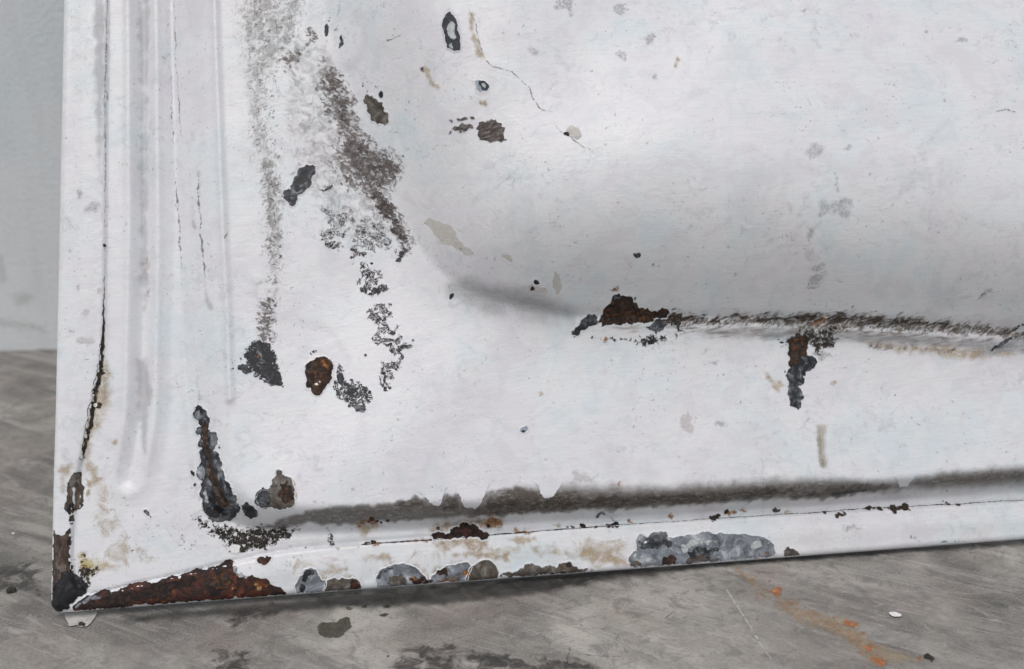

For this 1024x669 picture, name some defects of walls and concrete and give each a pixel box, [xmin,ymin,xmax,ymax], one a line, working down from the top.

peeling [440,9,462,53]
peeling [361,83,397,139]
peeling [281,163,319,209]
crack [78,276,105,460]
peeling [225,297,284,387]
rust [768,319,846,410]
rust [52,465,97,597]
rust [62,559,286,611]
peeling [190,403,297,524]
peeling [293,481,516,594]
peeling [535,478,562,498]
peeling [566,512,801,569]